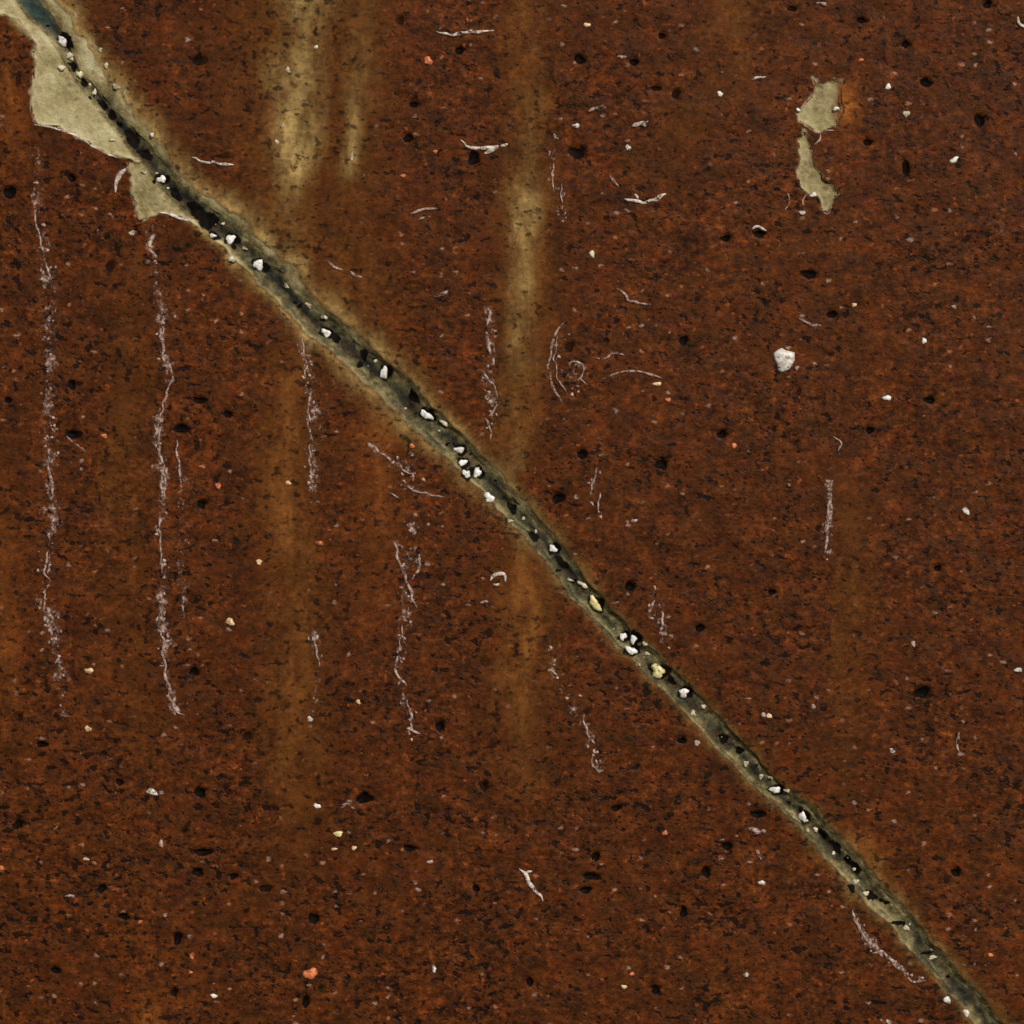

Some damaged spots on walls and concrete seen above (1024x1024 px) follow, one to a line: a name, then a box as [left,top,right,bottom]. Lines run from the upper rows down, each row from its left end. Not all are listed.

crack [17,0,88,87]
peeling [0,0,194,236]
crack [39,0,404,370]
peeling [785,77,842,215]
corrosion [838,83,858,124]
crack [81,75,638,655]
damp [36,598,70,681]
damp [152,464,170,536]
damp [156,575,180,712]
corrosion [259,349,320,813]
corrosion [495,550,552,778]
crack [623,630,1003,1024]